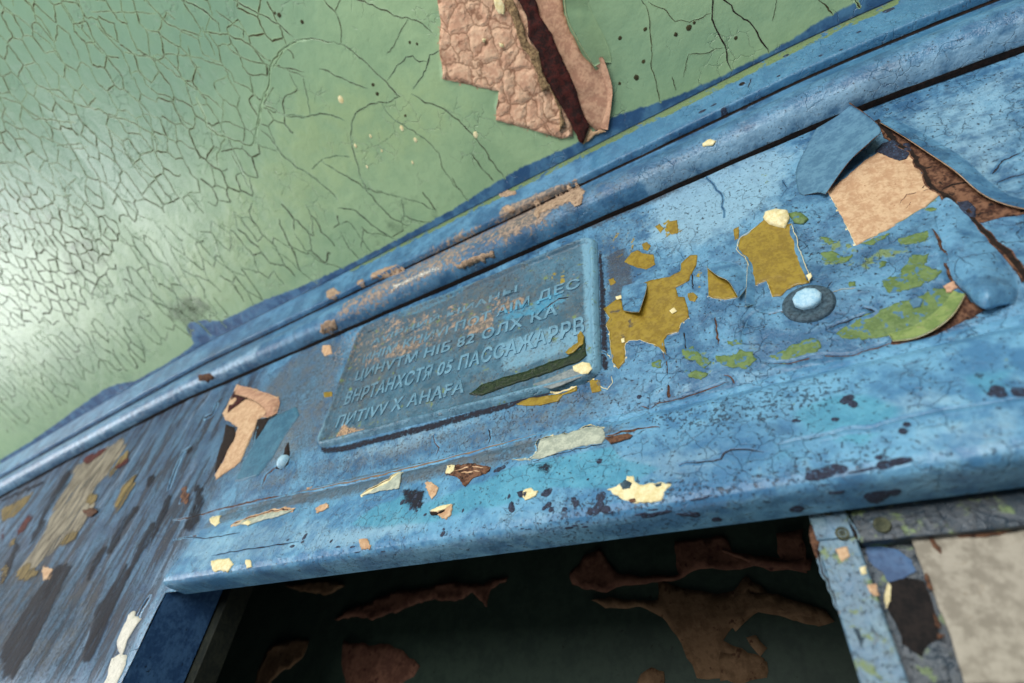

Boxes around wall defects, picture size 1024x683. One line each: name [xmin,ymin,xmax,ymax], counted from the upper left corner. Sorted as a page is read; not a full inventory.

peeling [434,0,613,144]
crack [0,0,506,432]
peeling [796,103,1024,345]
peeling [603,208,812,370]
crack [639,317,738,410]
peeling [1,439,128,581]
peeling [214,384,299,482]
peeling [512,423,660,463]
peeling [607,476,671,504]
crack [678,447,764,467]
peeling [104,611,142,683]
spalling [860,546,939,657]